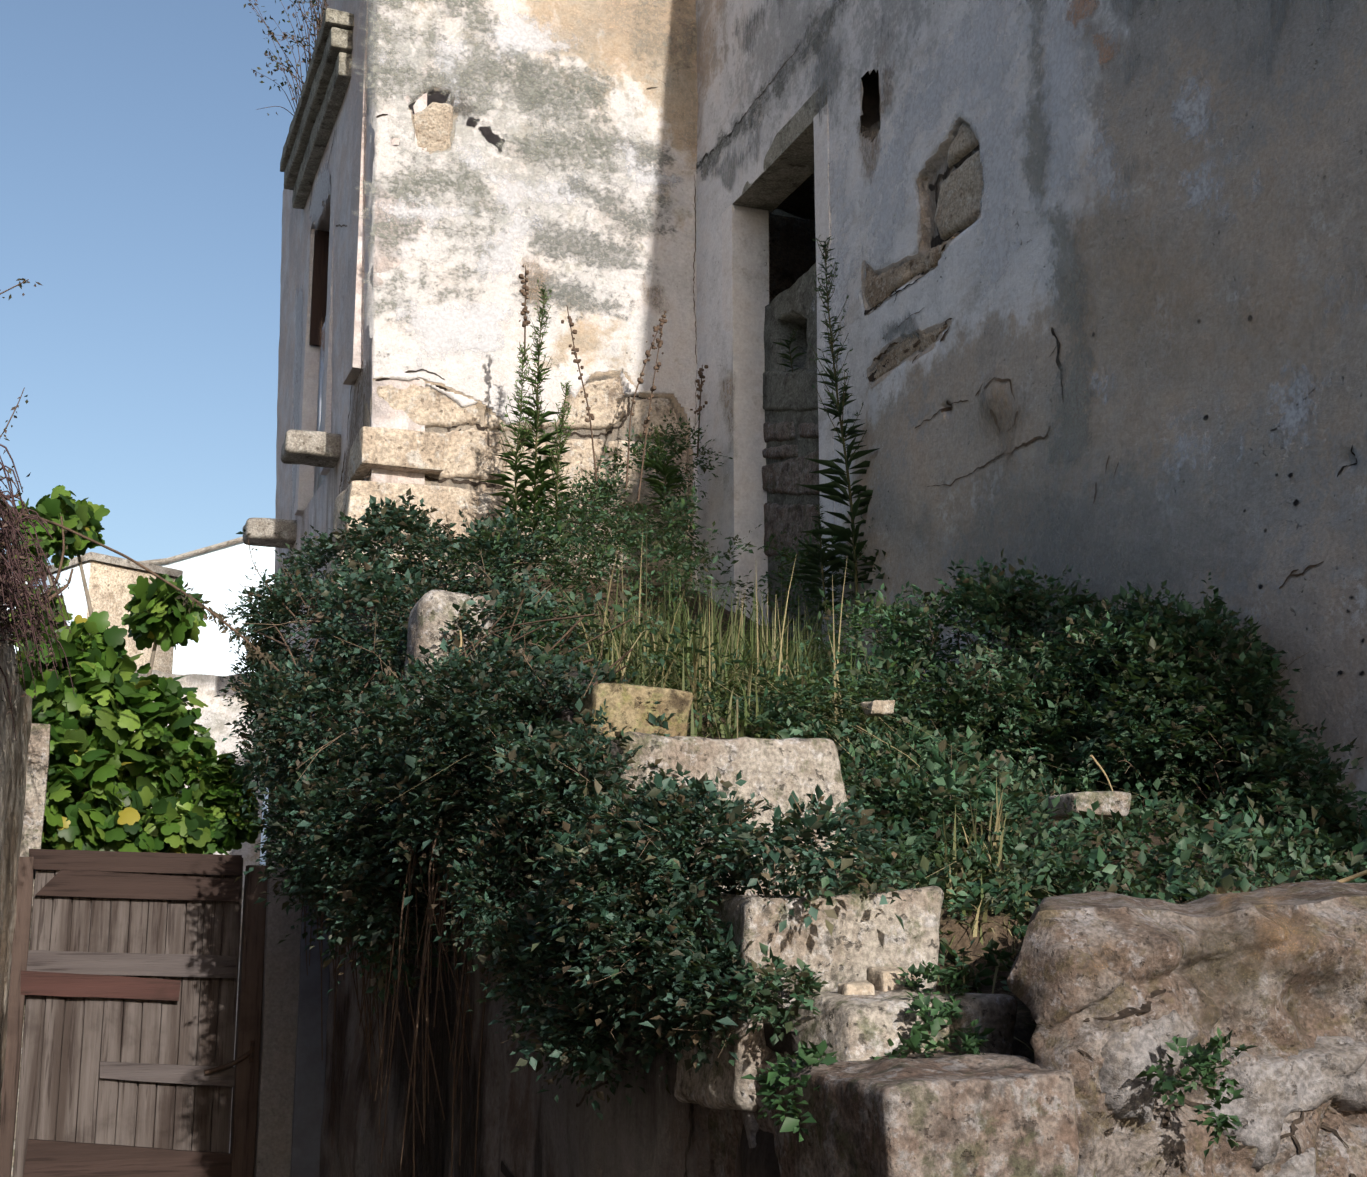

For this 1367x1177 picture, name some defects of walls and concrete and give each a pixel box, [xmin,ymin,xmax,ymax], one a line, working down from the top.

peeling [490,14,570,59]
peeling [383,203,463,227]
peeling [409,41,581,281]
damp [361,0,675,335]
peeling [617,141,676,192]
flaking render [864,122,984,315]
flaking render [326,304,690,594]
flaking render [868,308,952,382]
crack [915,400,968,428]
crack [928,327,1065,487]